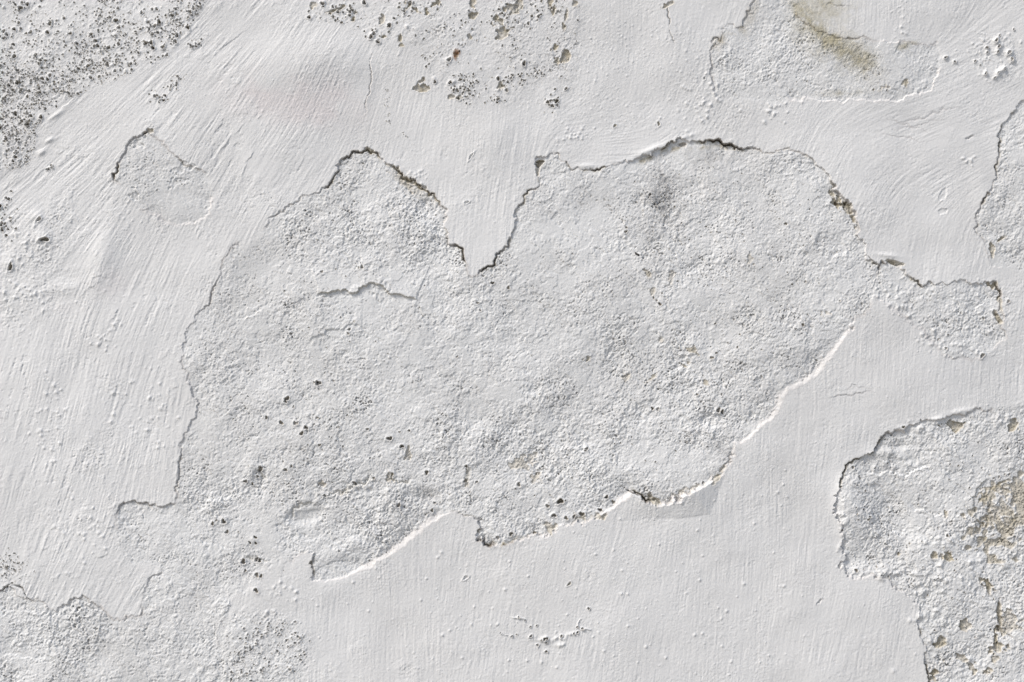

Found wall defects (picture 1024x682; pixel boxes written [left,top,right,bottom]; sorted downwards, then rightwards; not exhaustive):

peeling [709,0,942,104]
flaking render [973,100,1024,272]
flaking render [0,137,1024,682]